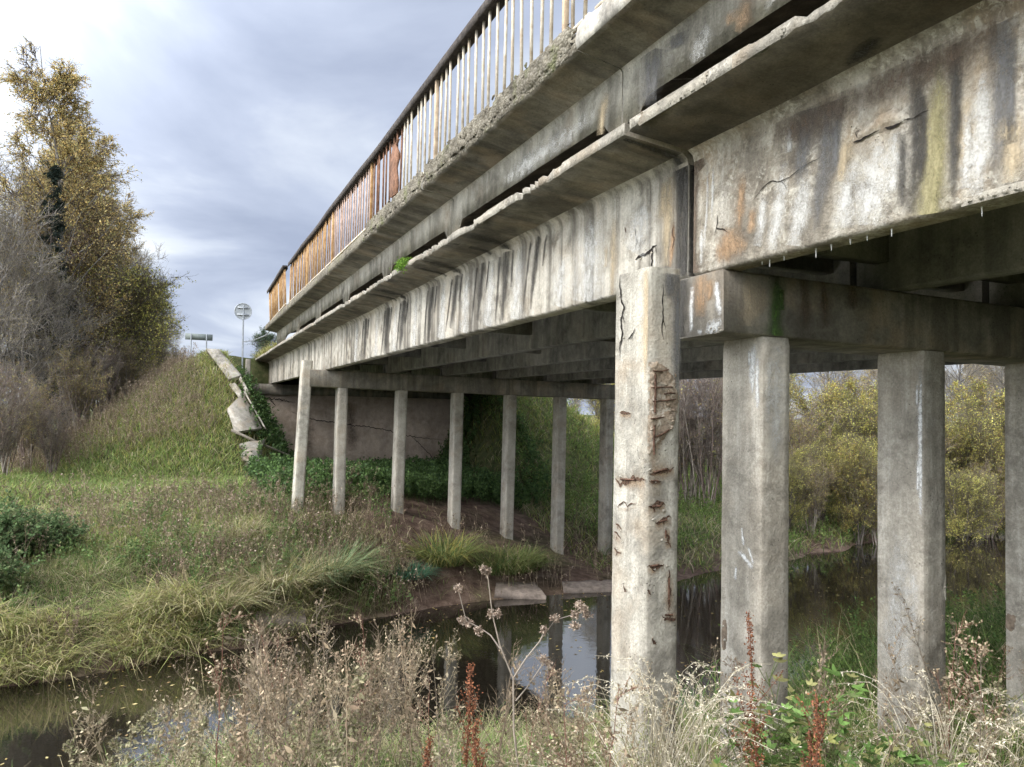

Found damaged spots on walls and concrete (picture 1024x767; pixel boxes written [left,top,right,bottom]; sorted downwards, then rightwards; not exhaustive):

crack [853,110,929,143]
leakage [840,20,1014,224]
leakage [759,178,785,242]
crack [754,157,820,199]
leakage [779,101,841,241]
crack [635,228,657,266]
leakage [355,234,546,360]
crack [619,281,635,351]
crack [659,288,667,340]
crack [256,397,434,460]
spalling [647,361,679,455]